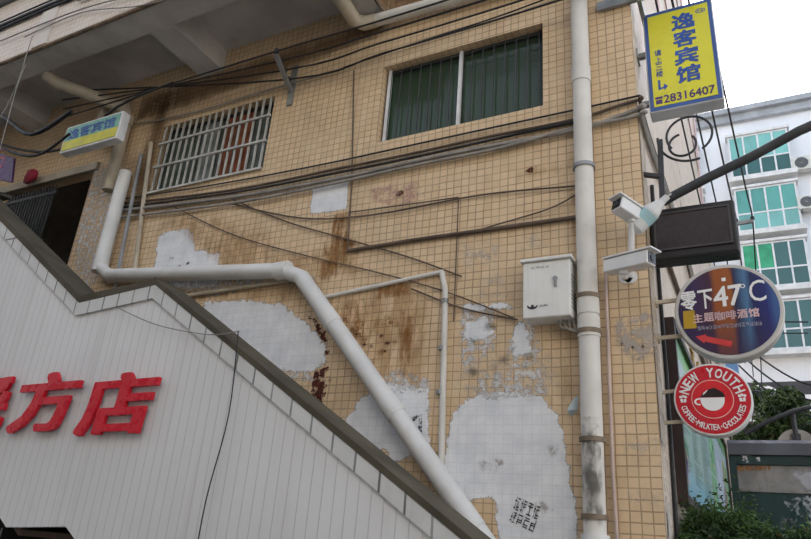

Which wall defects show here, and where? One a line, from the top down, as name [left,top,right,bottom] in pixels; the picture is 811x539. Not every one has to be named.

rust [321,215,354,279]
rust [378,283,408,298]
rust [343,306,373,348]
rust [385,318,411,360]
peeling [784,496,811,523]